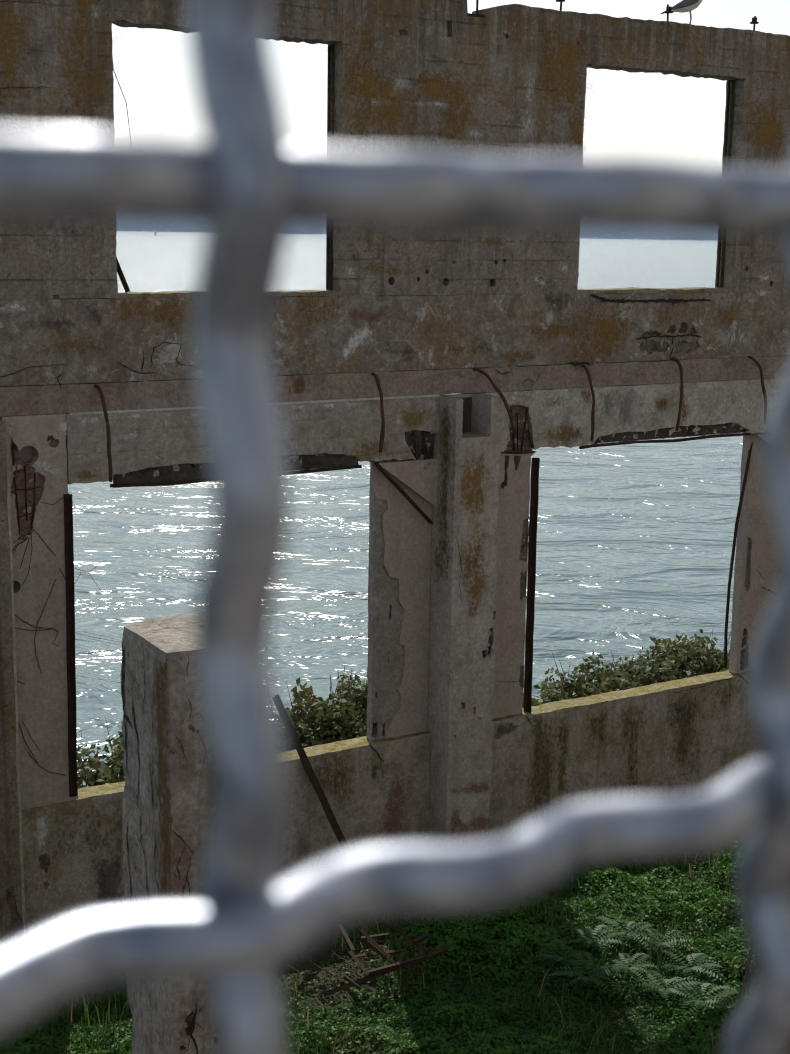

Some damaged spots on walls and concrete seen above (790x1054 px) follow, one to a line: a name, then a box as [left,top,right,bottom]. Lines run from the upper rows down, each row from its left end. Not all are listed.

spalling [638,322,698,355]
spalling [110,463,211,488]
spalling [287,453,362,475]
spalling [405,429,439,470]
spalling [579,422,751,449]
crack [184,1006,204,1054]